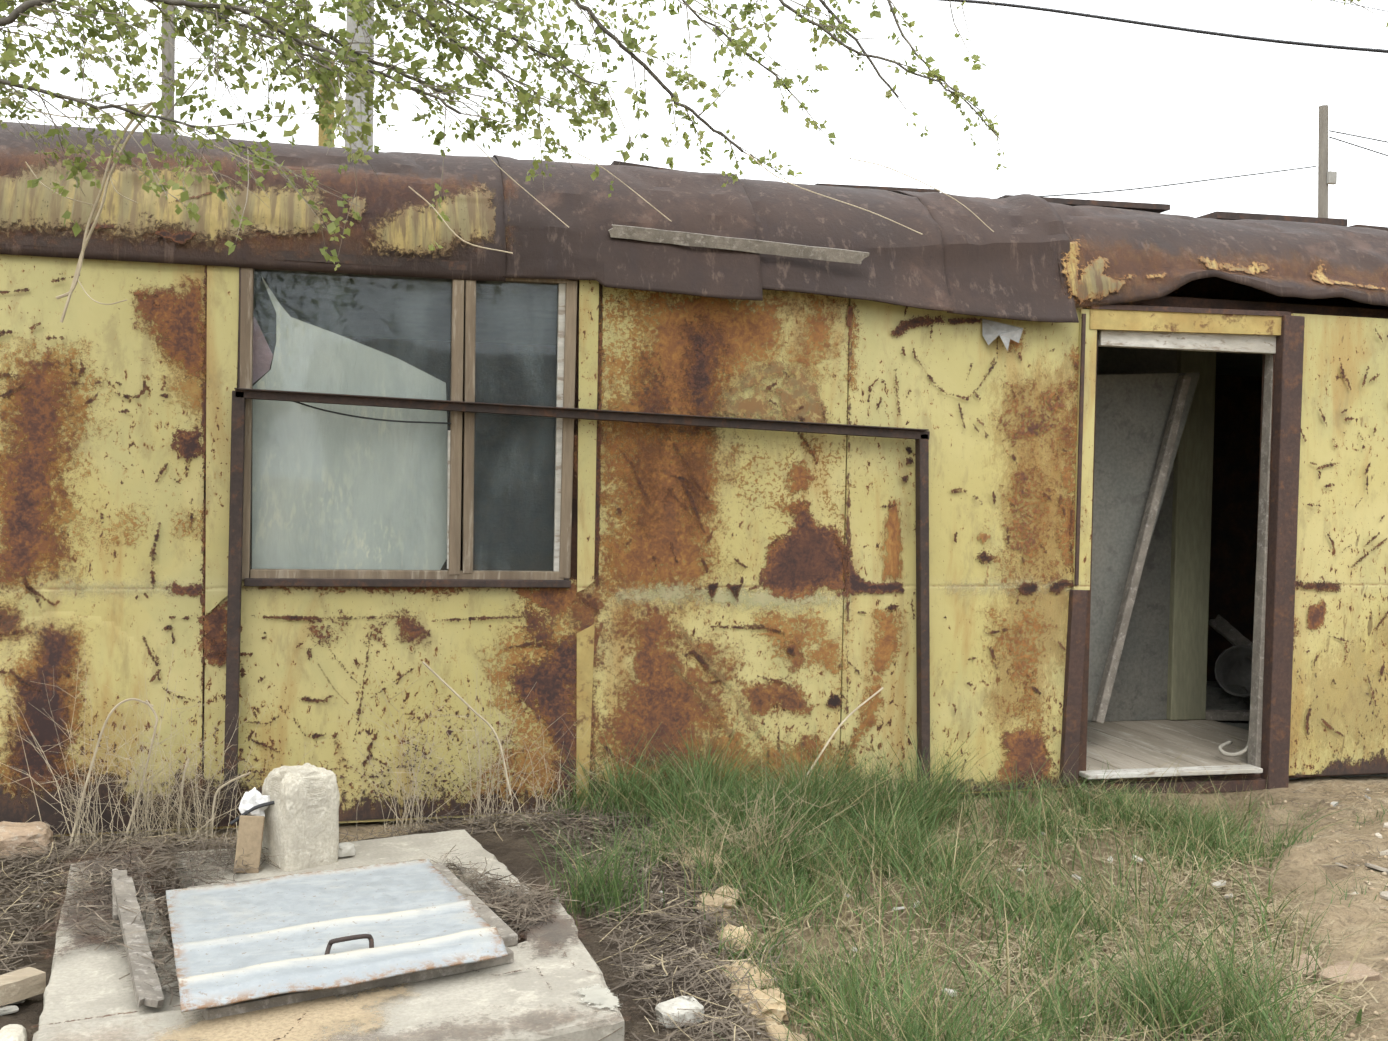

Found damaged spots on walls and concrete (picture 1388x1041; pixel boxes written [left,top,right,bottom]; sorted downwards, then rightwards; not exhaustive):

peeling [0,161,329,253]
peeling [347,183,506,258]
rust [0,337,280,835]
rust [130,265,227,693]
rust [243,585,489,660]
rust [312,286,1079,821]
rust [1289,580,1388,777]